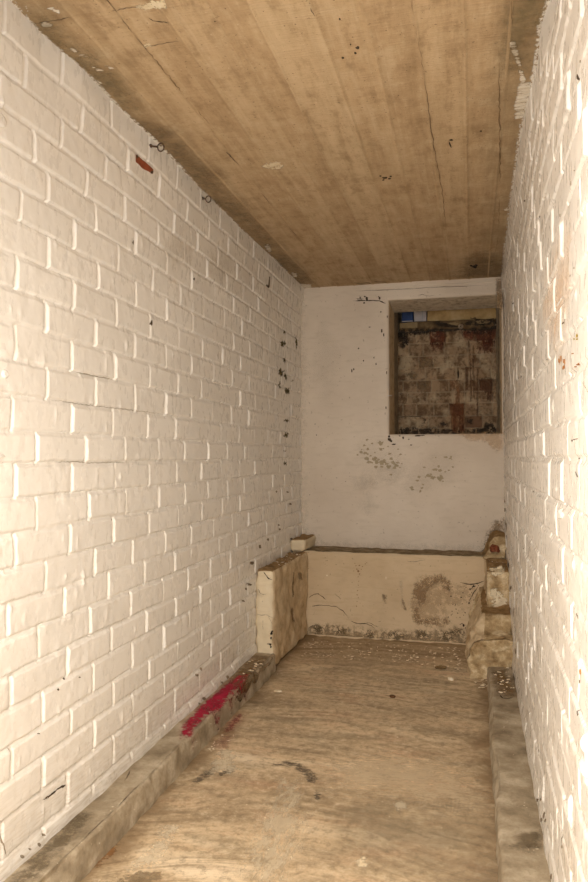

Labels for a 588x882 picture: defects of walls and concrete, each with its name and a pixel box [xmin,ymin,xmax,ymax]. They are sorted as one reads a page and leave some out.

corrosion [450,380,465,433]
peeling [357,435,424,476]
damp [309,575,479,643]